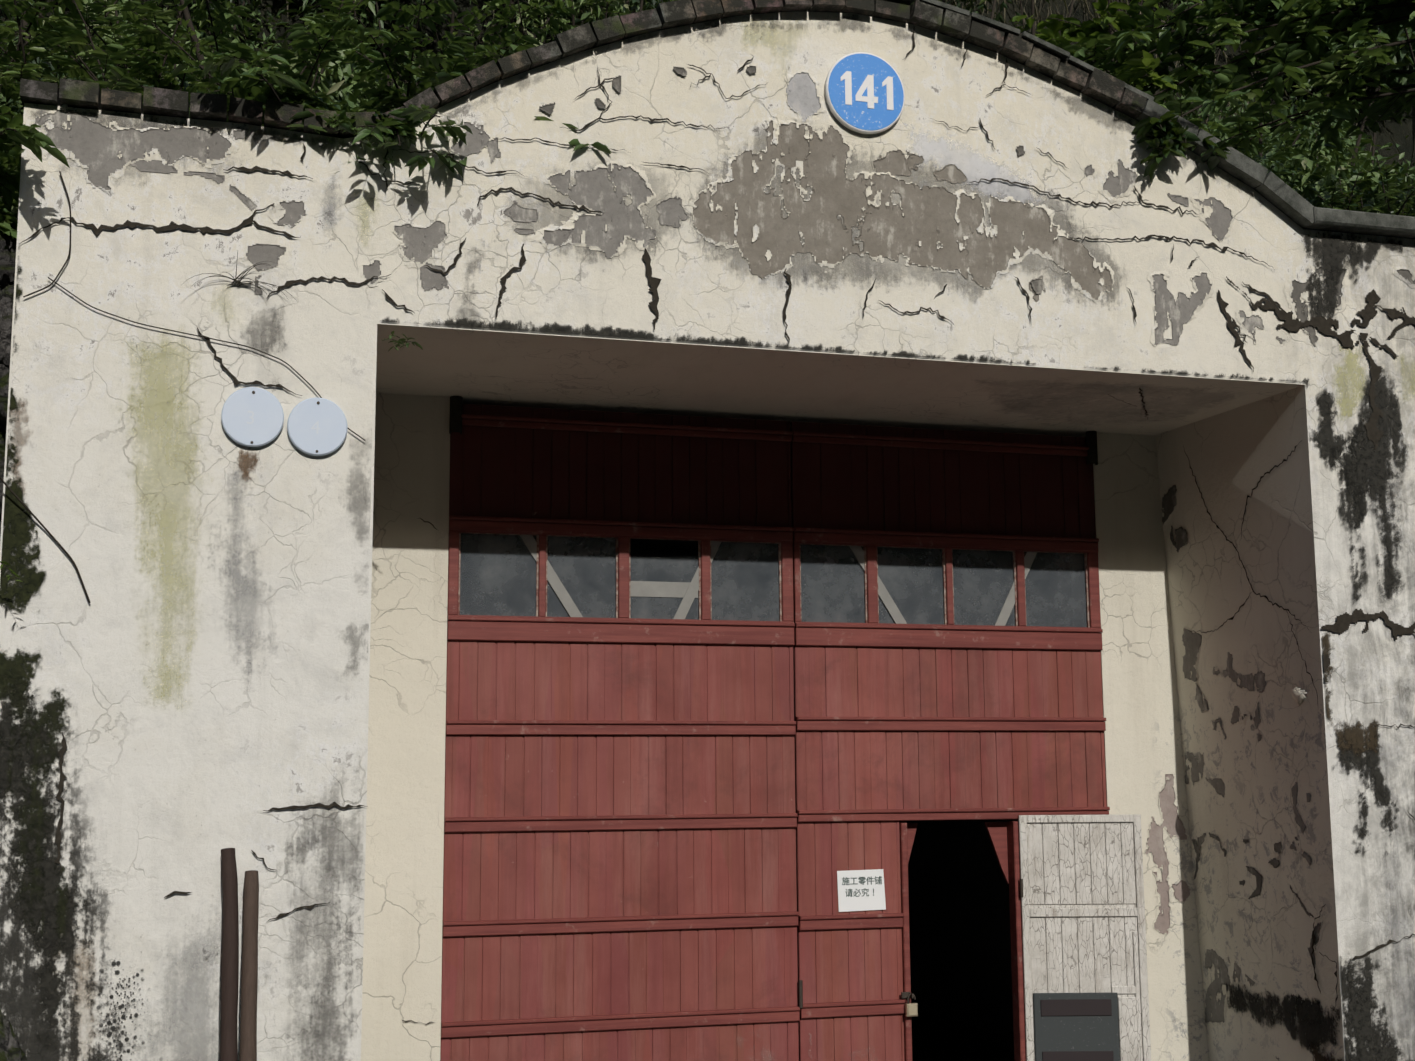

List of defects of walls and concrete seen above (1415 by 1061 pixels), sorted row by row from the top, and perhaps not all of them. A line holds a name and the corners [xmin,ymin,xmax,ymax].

crack [19,143,313,244]
flaking render [393,218,449,291]
crack [353,55,768,213]
flaking render [501,66,1115,304]
crack [930,59,1415,450]
flaking render [1147,270,1214,346]
water stain [1304,232,1403,320]
water stain [0,388,46,613]
crack [1183,440,1415,715]
water stain [0,649,144,1061]
flaking render [1145,751,1226,934]
water stain [1226,956,1409,1061]